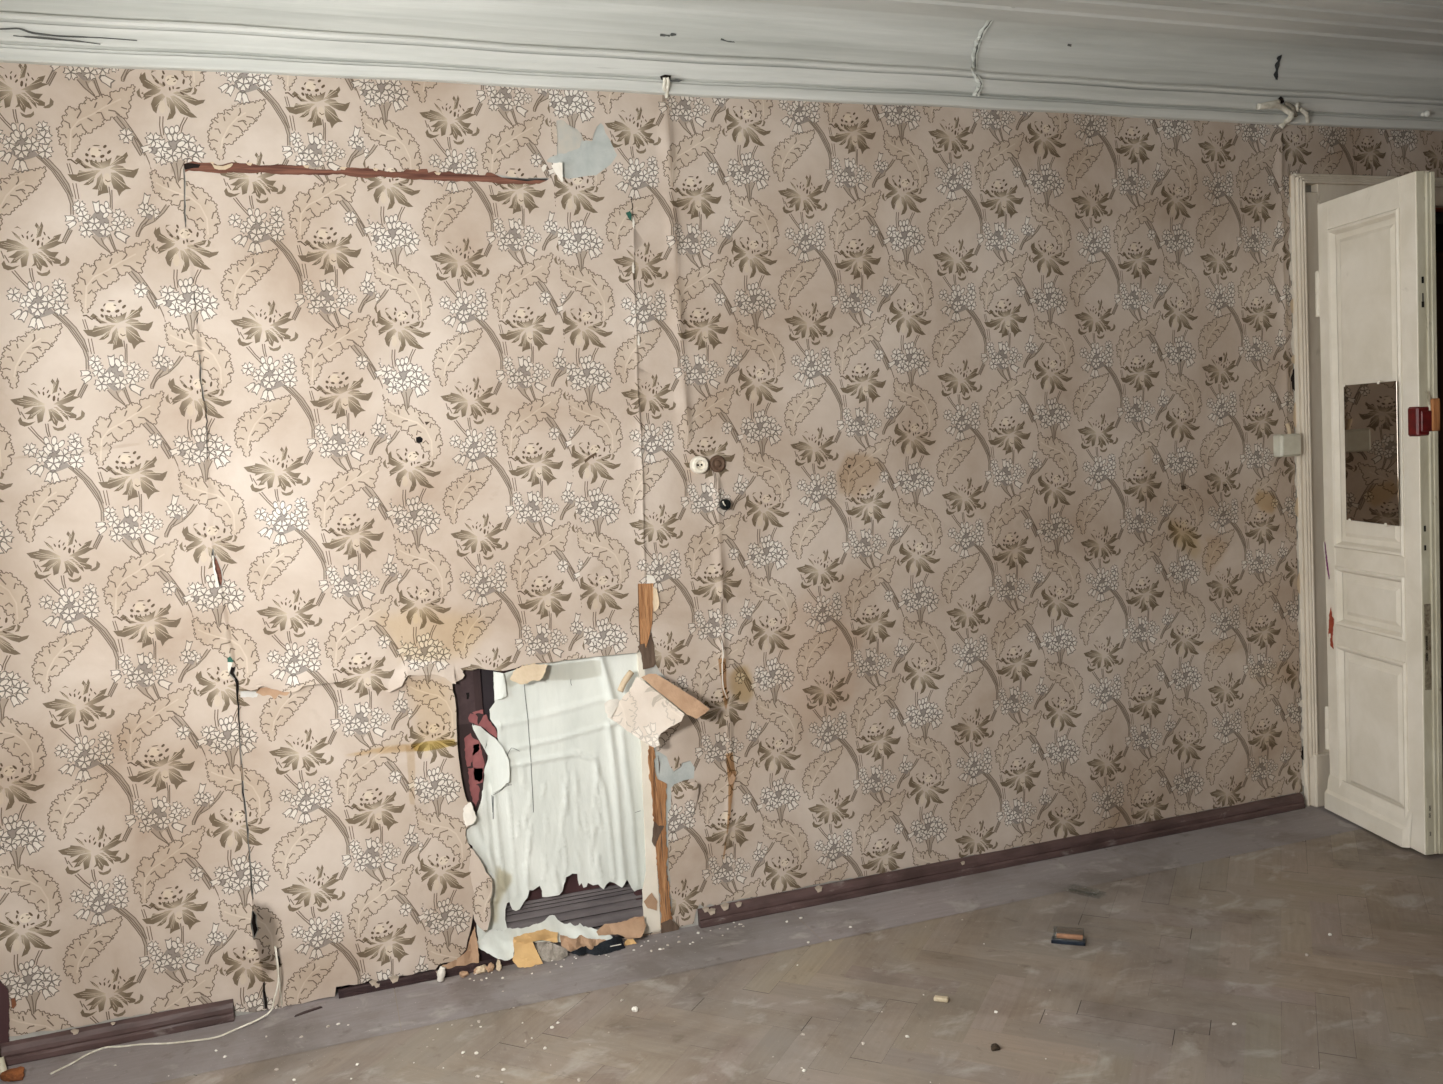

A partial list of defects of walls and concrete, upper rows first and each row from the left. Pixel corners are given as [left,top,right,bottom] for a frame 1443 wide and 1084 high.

crack [971,7,1015,96]
peeling [541,120,617,182]
crack [212,553,222,587]
crack [227,657,257,937]
peeling [654,752,695,864]